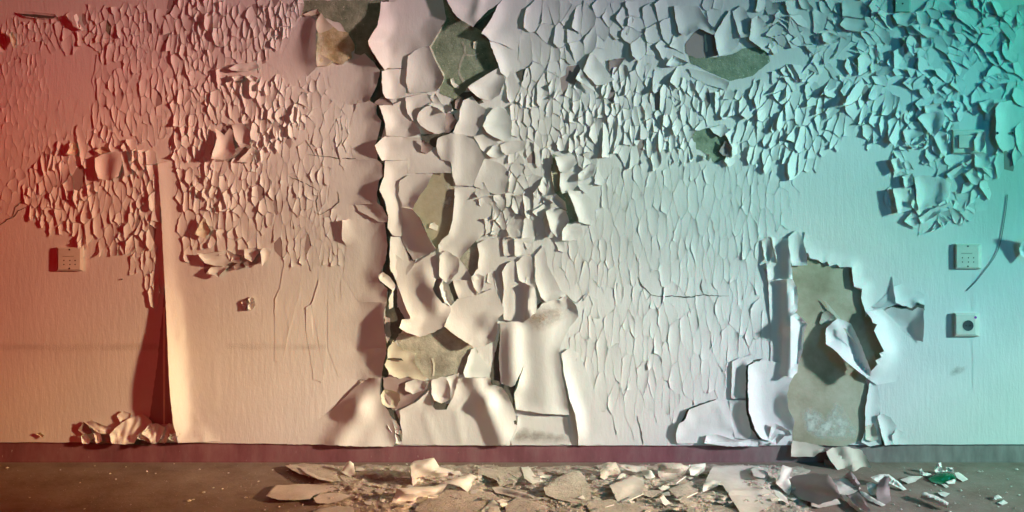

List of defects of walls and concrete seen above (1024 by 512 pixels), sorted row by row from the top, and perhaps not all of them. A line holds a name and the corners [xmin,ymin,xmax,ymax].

peeling [22,125,164,310]
peeling [0,0,381,277]
crack [261,72,356,382]
peeling [374,96,393,105]
crack [541,137,802,440]
peeling [378,0,1024,446]
spalling [676,231,909,508]